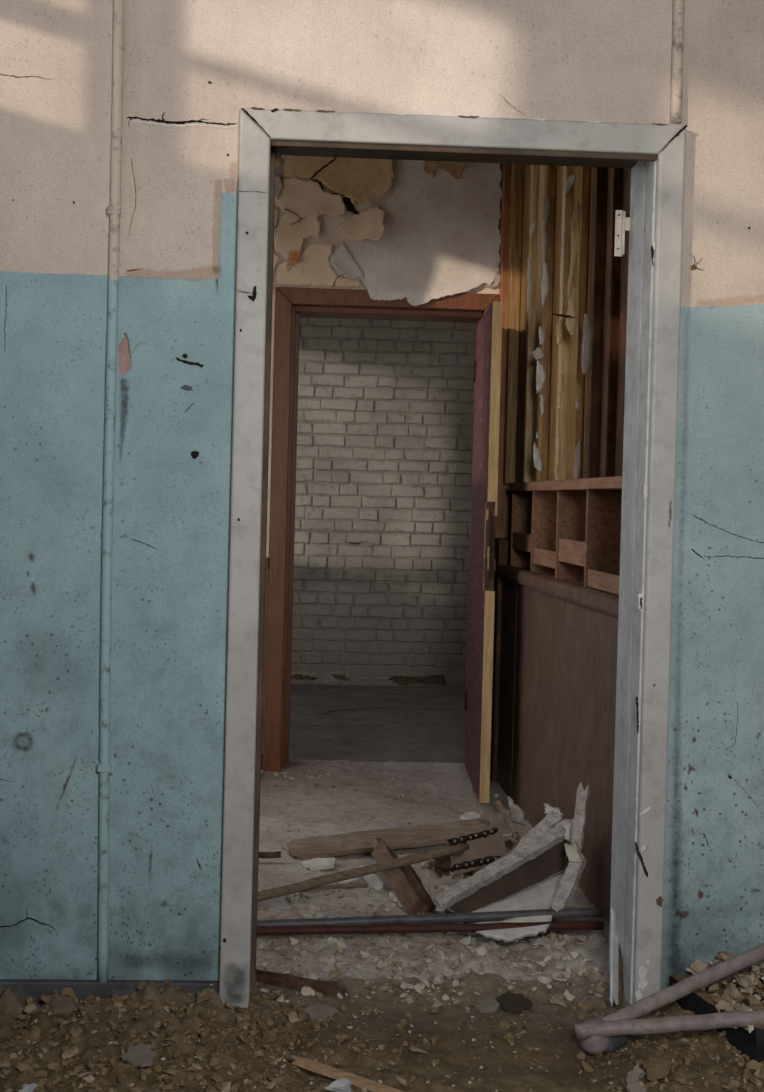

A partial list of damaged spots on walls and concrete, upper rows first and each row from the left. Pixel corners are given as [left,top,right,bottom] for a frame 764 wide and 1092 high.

crack [126,108,271,138]
flaking render [273,155,503,306]
crack [693,515,764,559]
crack [0,906,56,930]